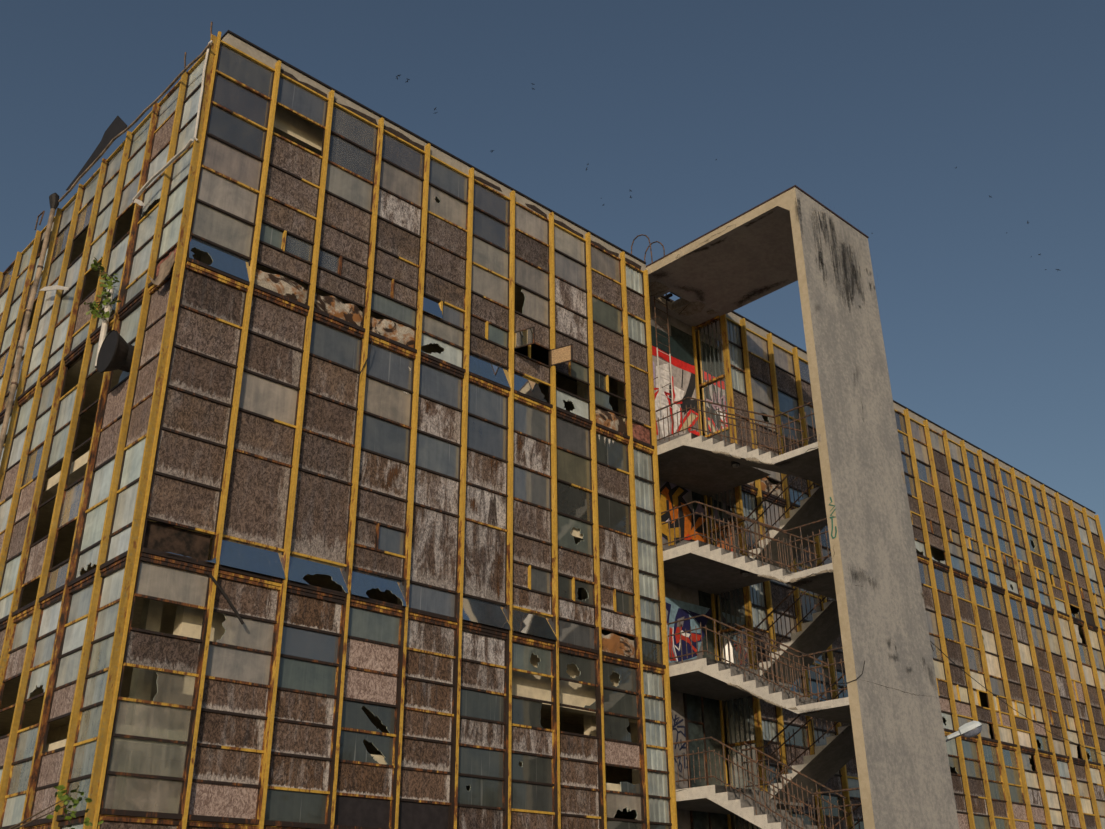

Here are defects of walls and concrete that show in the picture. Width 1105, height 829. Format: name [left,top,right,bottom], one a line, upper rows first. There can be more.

damp [796,199,872,308]